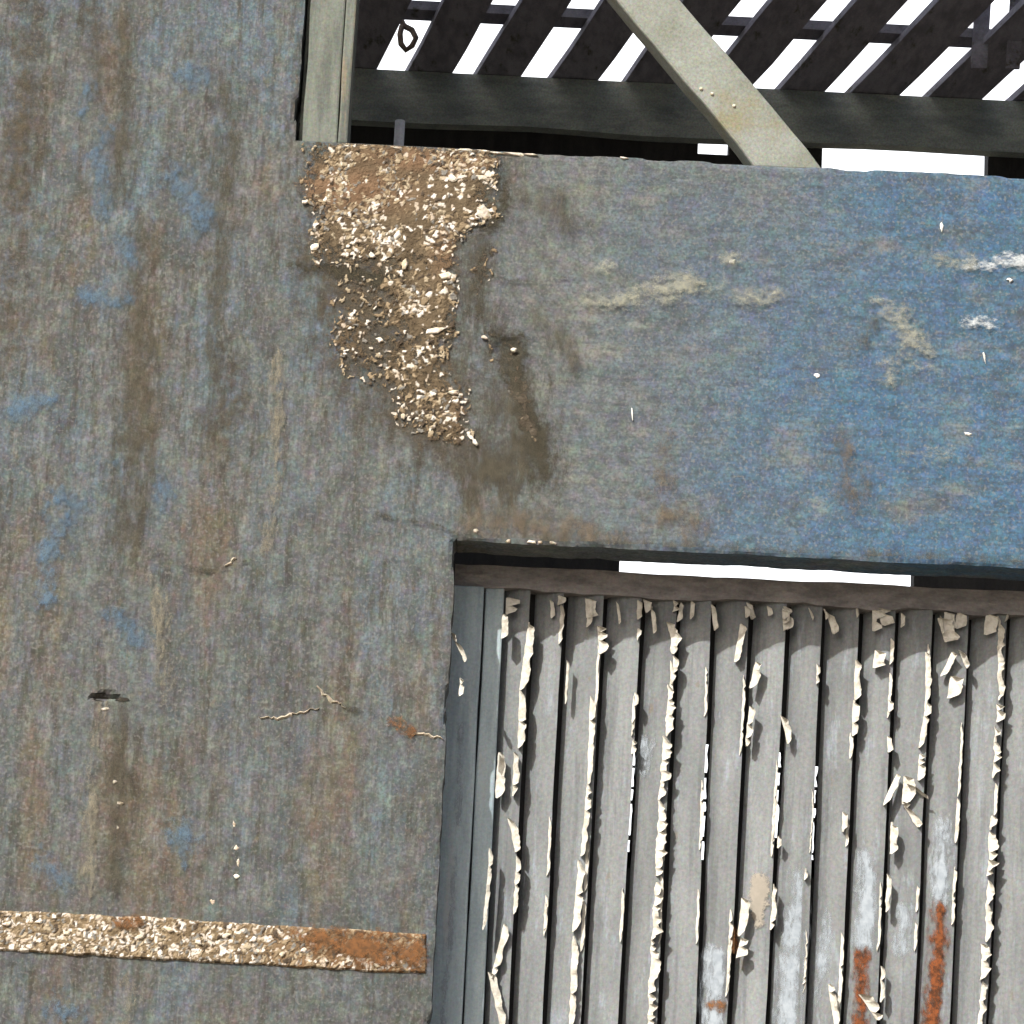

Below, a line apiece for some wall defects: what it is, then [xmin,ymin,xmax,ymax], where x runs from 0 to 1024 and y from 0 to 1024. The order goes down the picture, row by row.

spalling [294,141,543,456]
water stain [469,157,509,291]
water stain [938,252,1024,270]
water stain [290,220,705,547]
crack [259,685,359,721]
crack [412,731,443,739]
peeling [631,599,695,1024]
peeling [696,612,970,1024]
spalling [0,911,427,973]
rust [291,927,427,966]
rust [851,948,871,1024]
rust [920,901,949,1024]